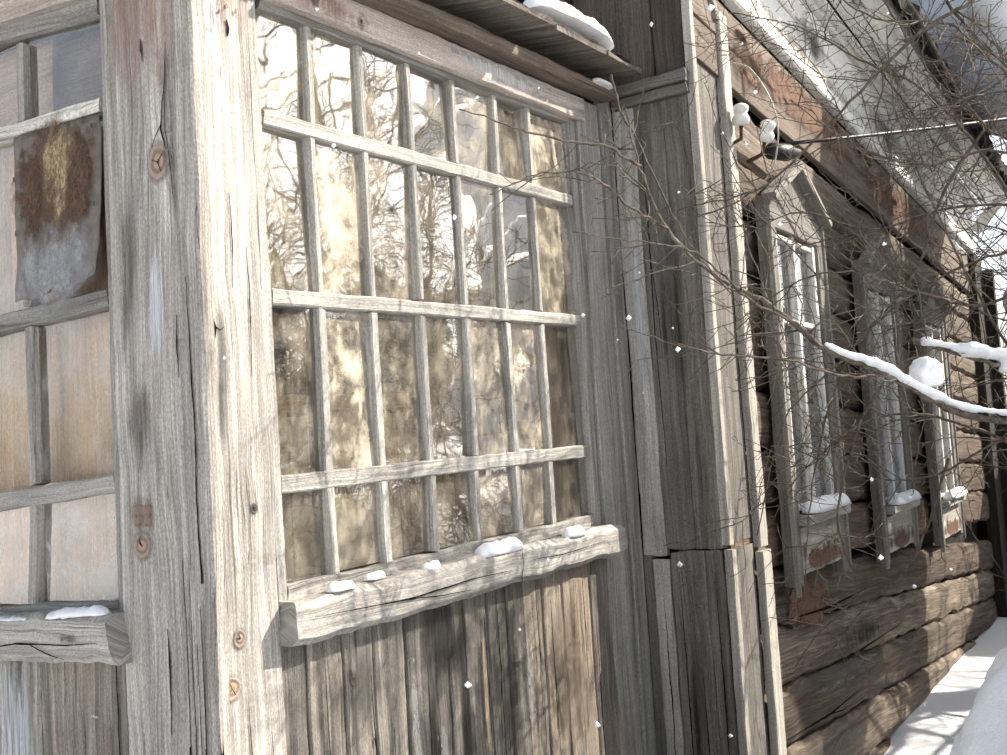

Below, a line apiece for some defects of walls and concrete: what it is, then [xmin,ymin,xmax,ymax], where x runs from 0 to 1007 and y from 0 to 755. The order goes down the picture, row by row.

rust [12,119,94,251]
crack [140,39,173,195]
crack [229,195,252,367]
crack [167,277,224,755]
crack [248,702,274,755]